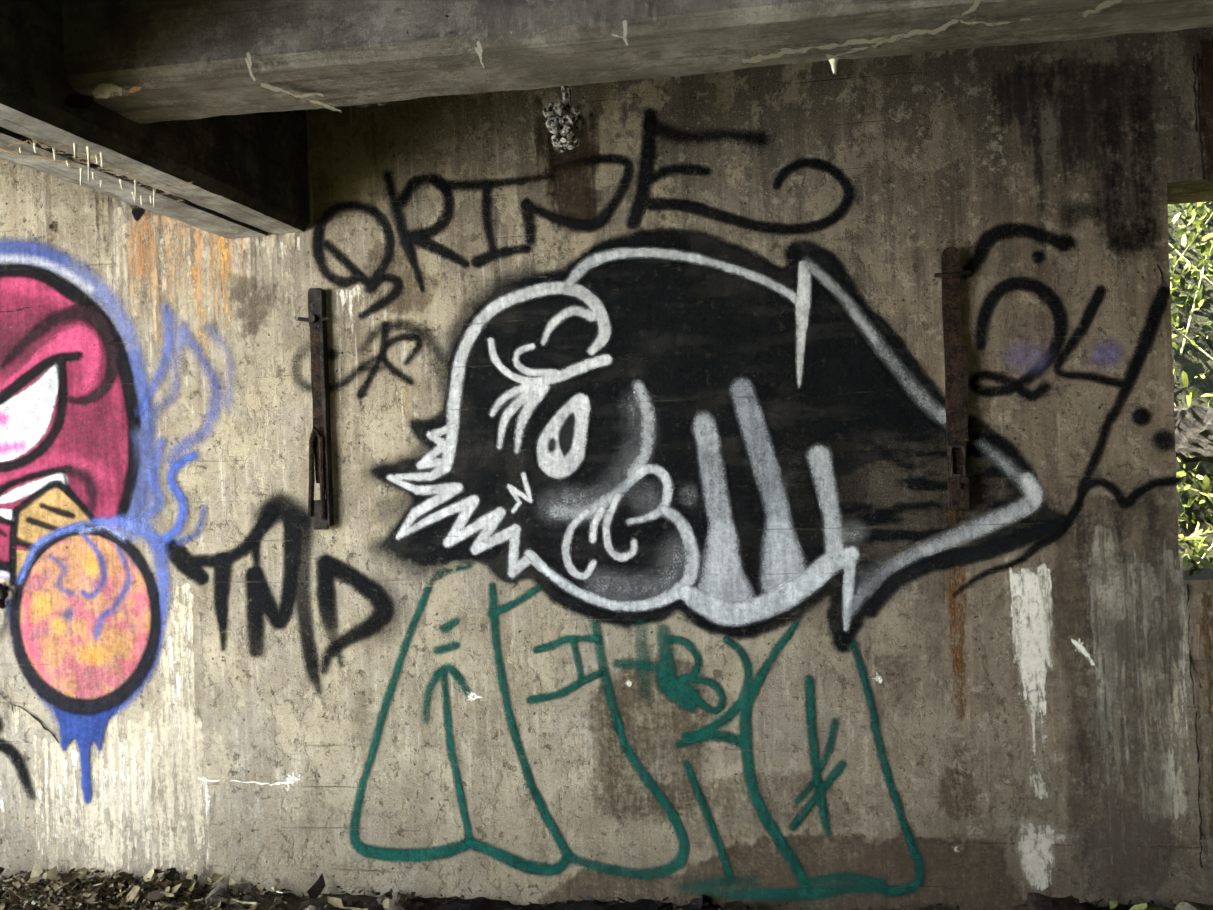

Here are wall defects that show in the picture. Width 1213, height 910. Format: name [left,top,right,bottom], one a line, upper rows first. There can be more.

crack [741,0,1032,64]
crack [0,140,77,167]
damp [991,59,1160,252]
damp [539,489,1193,910]
rust [948,564,966,716]